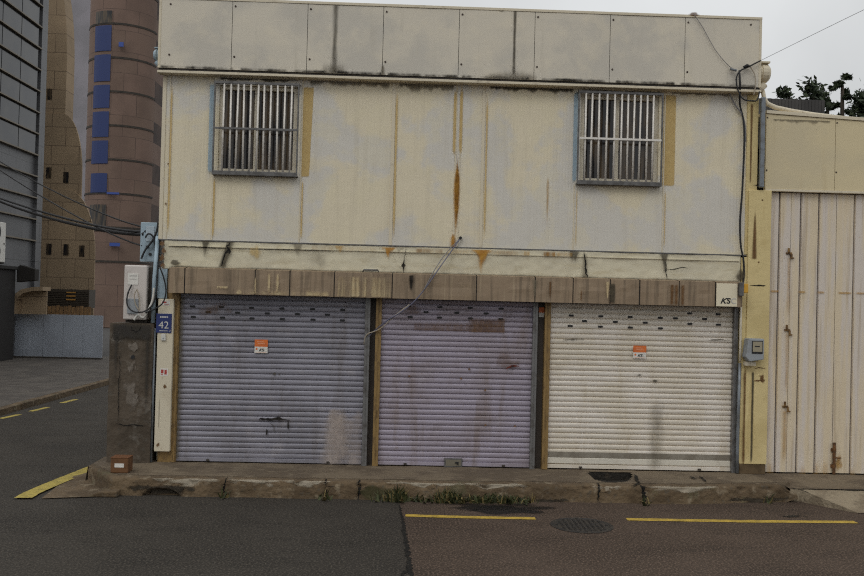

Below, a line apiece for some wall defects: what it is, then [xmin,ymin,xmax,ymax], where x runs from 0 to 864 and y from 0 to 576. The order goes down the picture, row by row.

leakage [302,6,471,78]
leakage [489,11,532,80]
rust [473,250,490,265]